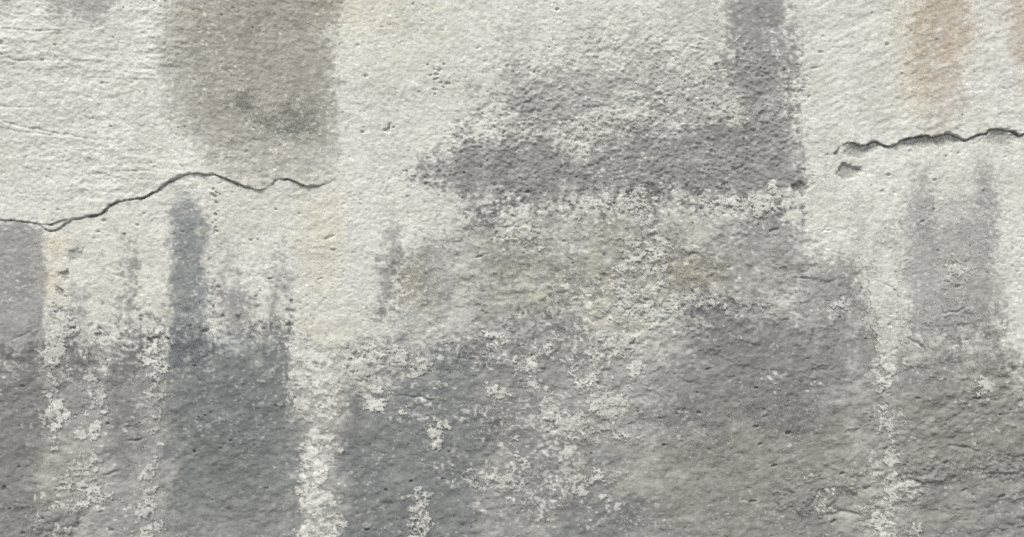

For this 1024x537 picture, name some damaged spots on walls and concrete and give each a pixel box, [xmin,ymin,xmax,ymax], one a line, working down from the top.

crack [833,129,1024,155]
crack [47,181,171,225]